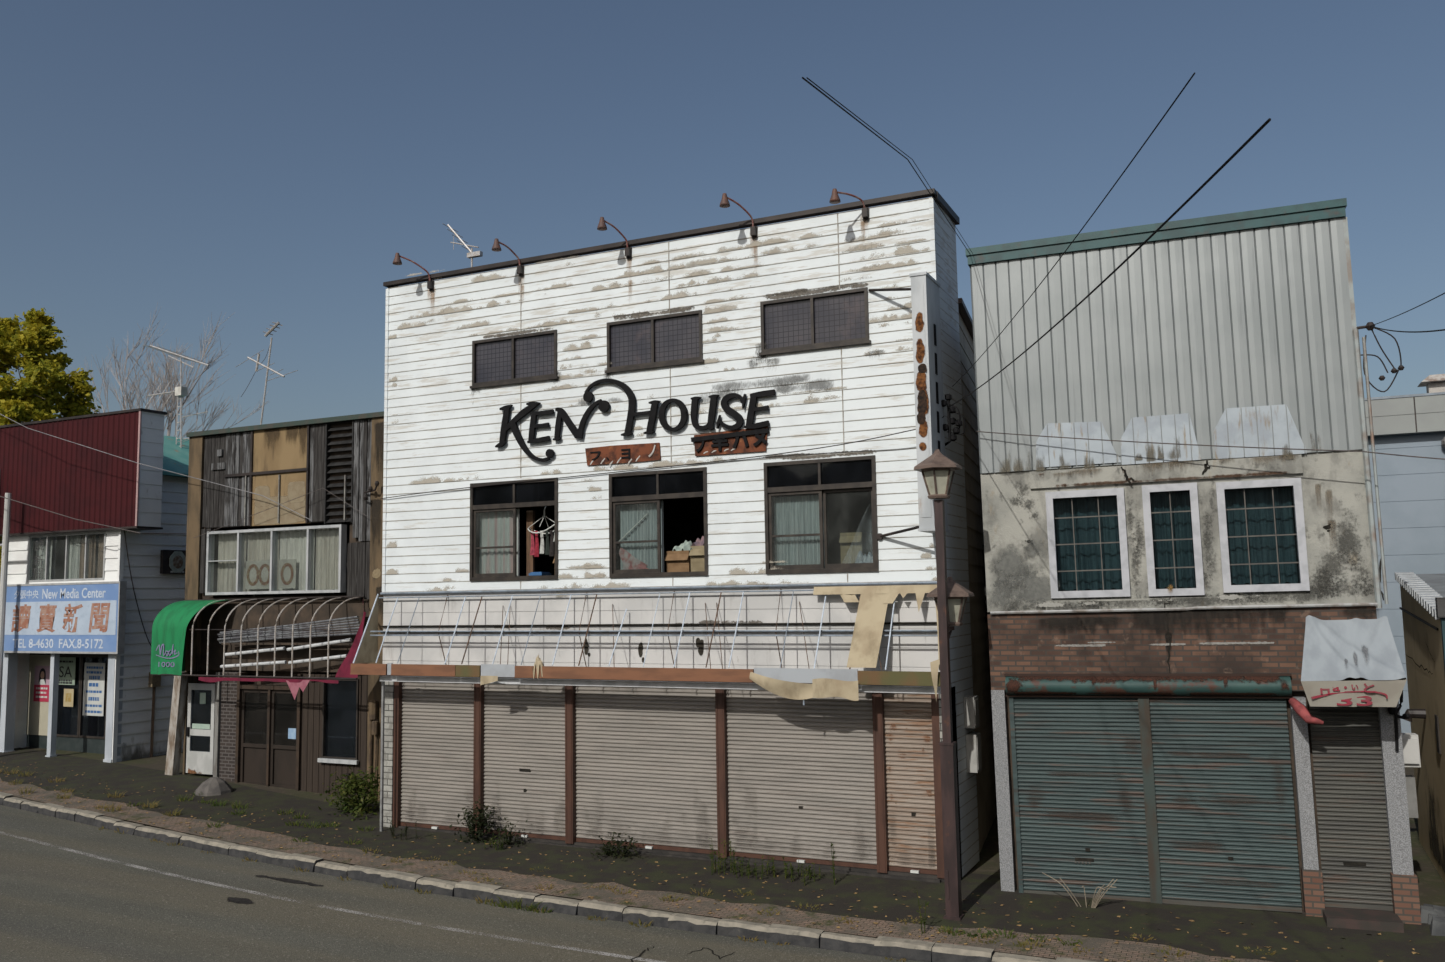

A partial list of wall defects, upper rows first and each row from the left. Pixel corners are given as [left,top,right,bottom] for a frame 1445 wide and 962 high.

peeling [388,233,822,371]
peeling [763,222,929,355]
peeling [548,334,607,407]
peeling [799,386,844,403]
peeling [411,477,476,485]
peeling [585,458,731,499]
peeling [540,563,629,597]
peeling [707,560,808,590]
damp [992,541,1286,651]
damp [1345,609,1378,617]
corrosion [1006,676,1289,696]